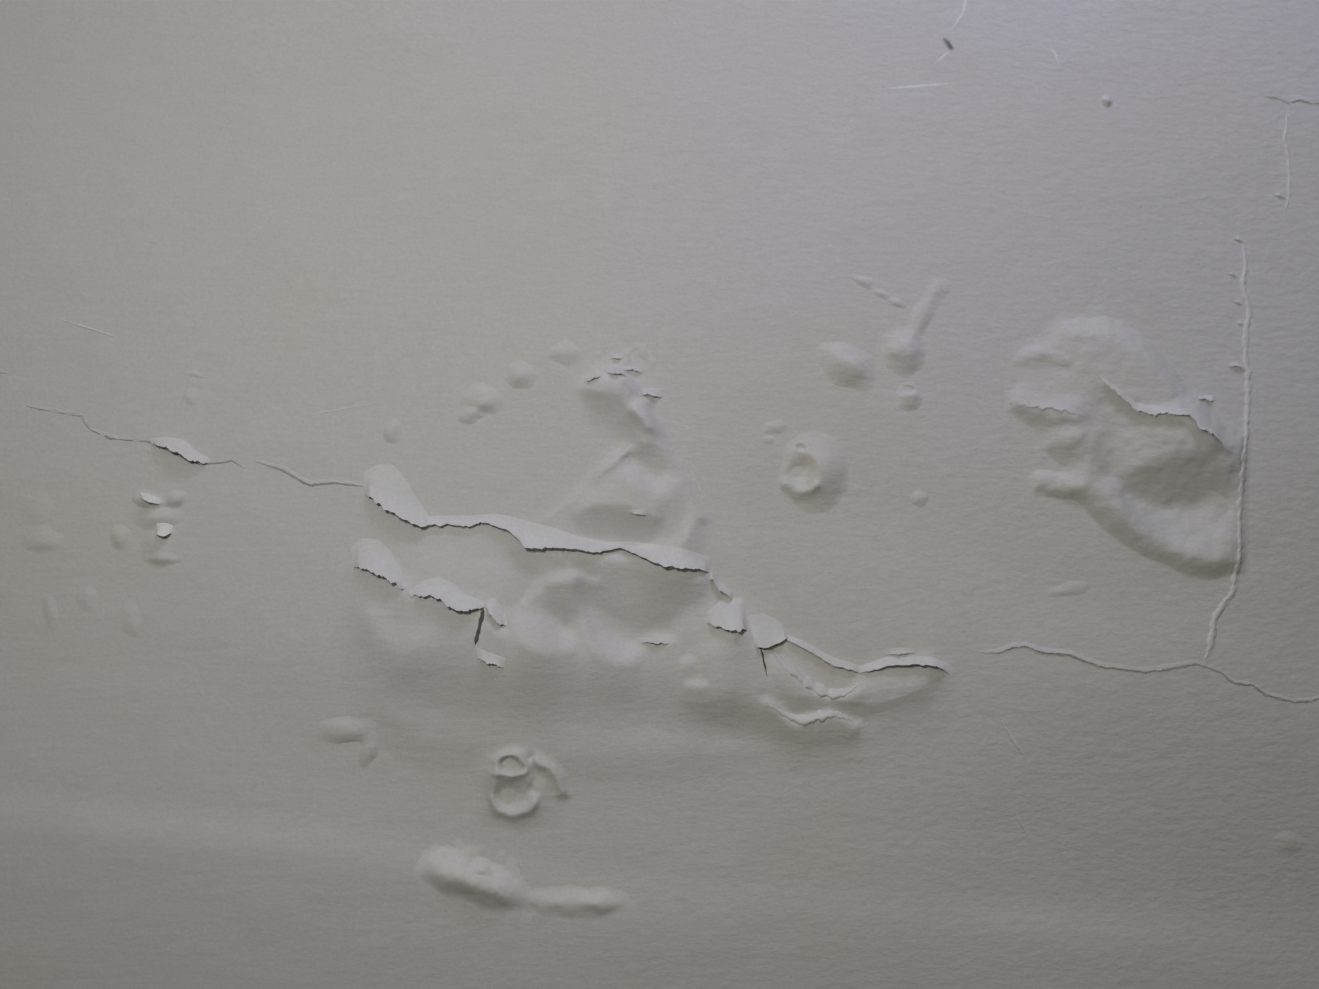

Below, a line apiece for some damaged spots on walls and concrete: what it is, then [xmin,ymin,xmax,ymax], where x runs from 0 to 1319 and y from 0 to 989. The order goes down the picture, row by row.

crack [1265,95,1319,220]
crack [25,405,364,487]
flaking render [332,350,960,783]
crack [980,237,1319,703]